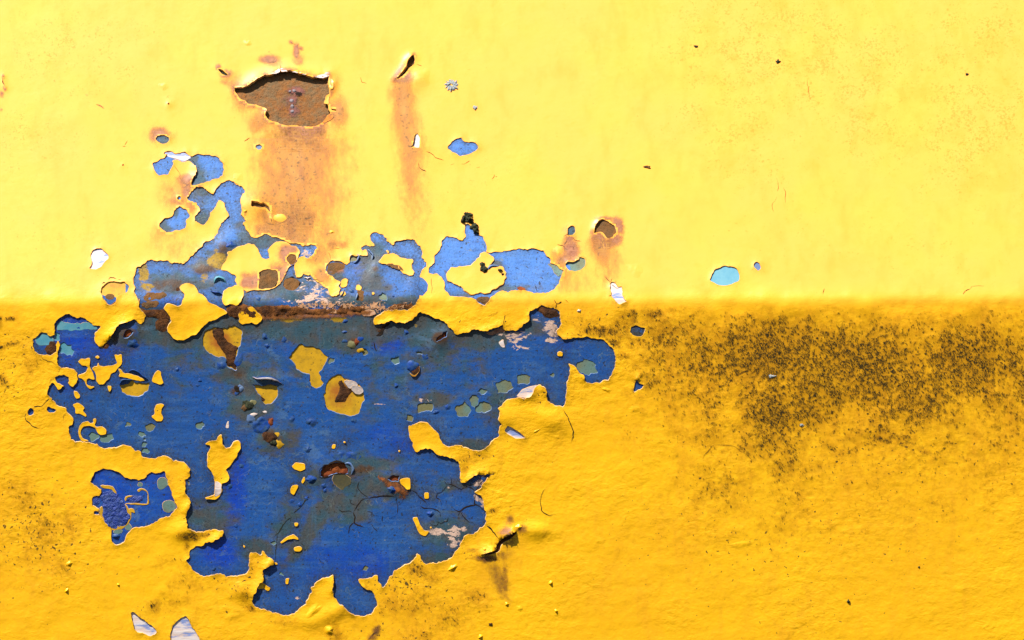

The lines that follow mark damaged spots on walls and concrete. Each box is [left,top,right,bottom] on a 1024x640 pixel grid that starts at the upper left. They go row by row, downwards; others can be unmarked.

spalling [235,68,336,127]
rust [393,65,420,186]
rust [216,41,344,282]
rust [557,236,579,267]
rust [591,217,623,266]
peeling [710,266,739,286]
peeling [25,136,616,616]
mould [579,304,1024,535]
crack [340,478,486,533]
peeling [131,612,156,636]
peeling [170,617,200,640]